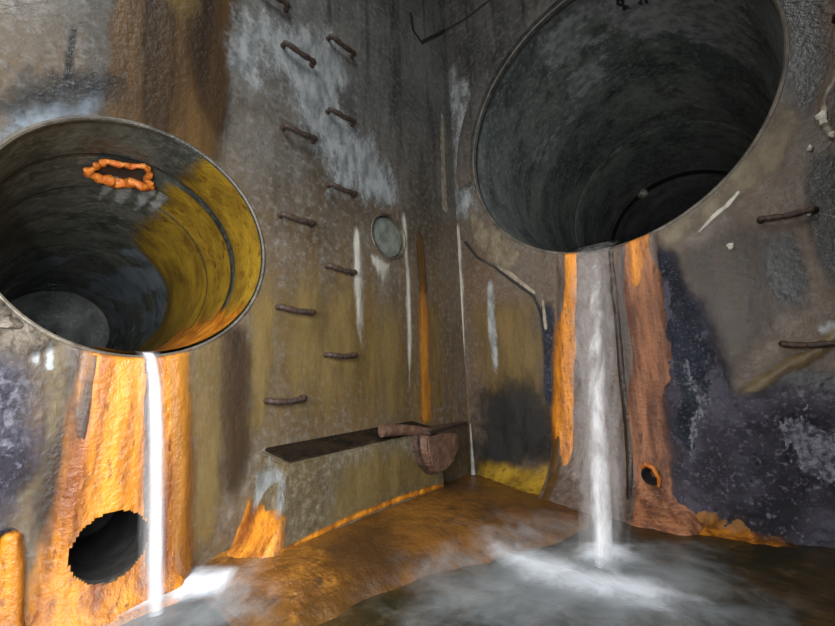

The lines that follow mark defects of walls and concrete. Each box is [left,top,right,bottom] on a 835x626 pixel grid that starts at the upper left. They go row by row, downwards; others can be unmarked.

efflorescence [224,9,396,207]
damp [662,0,832,244]
damp [806,155,835,281]
damp [0,354,41,527]
damp [32,347,54,370]
rust [22,335,85,527]
damp [478,253,579,501]
damp [608,234,705,536]
damp [818,321,835,334]
rust [208,484,442,623]